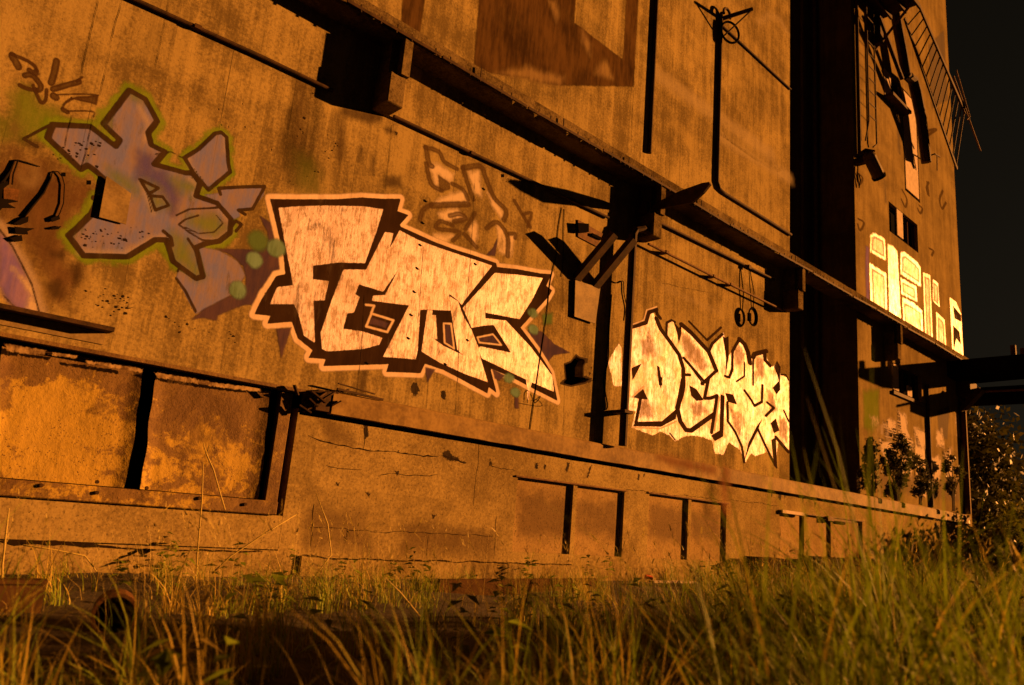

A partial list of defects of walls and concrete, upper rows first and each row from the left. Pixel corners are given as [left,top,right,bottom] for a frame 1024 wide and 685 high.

crack [308,432,515,492]